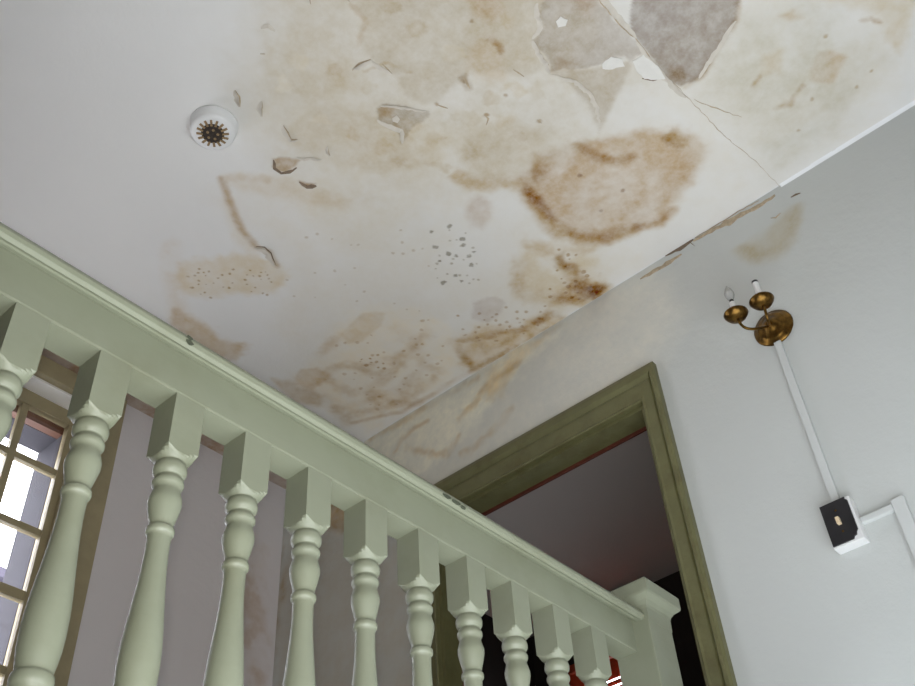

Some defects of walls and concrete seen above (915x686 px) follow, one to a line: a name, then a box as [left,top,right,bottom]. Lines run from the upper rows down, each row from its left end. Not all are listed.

peeling [254,0,745,189]
crack [599,0,800,280]
damp [153,0,915,485]
damp [41,348,79,374]
damp [125,393,155,418]
damp [269,471,287,489]